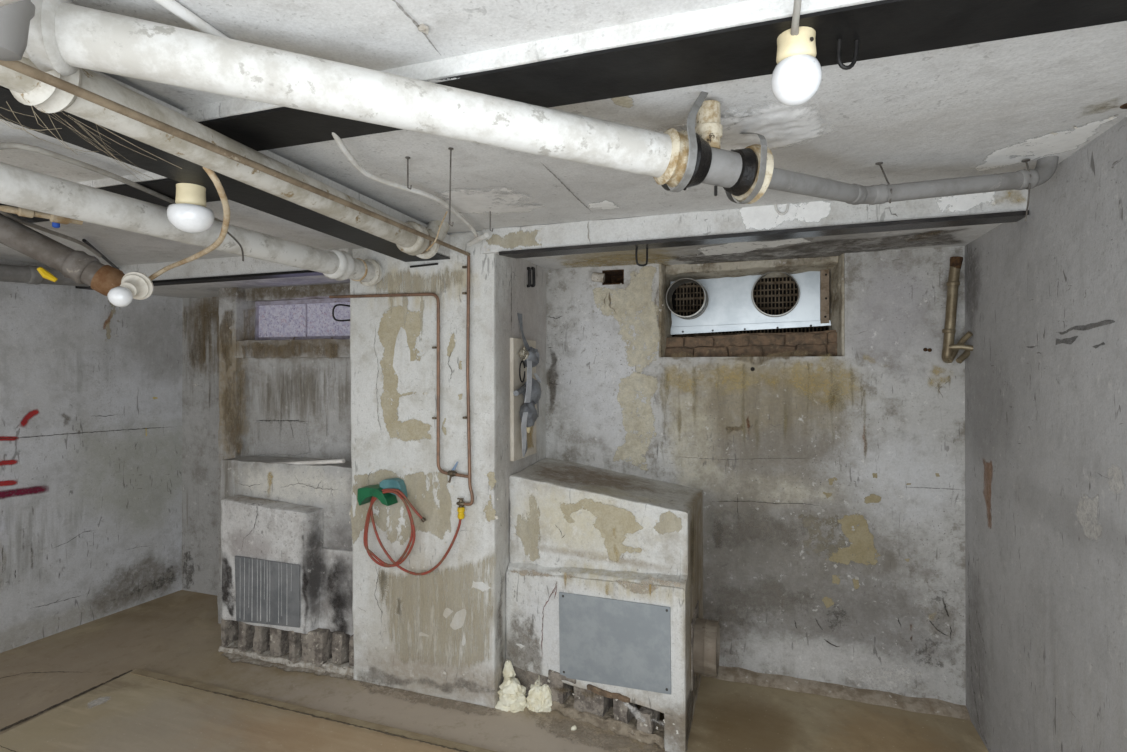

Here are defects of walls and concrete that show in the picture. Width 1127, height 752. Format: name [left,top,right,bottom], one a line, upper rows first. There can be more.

peeling [974,103,1127,171]
damp [184,309,254,454]
peeling [378,305,446,443]
peeling [447,333,462,369]
flaking render [589,264,663,471]
peeling [483,472,540,563]
peeling [554,498,685,562]
peeling [790,477,882,591]